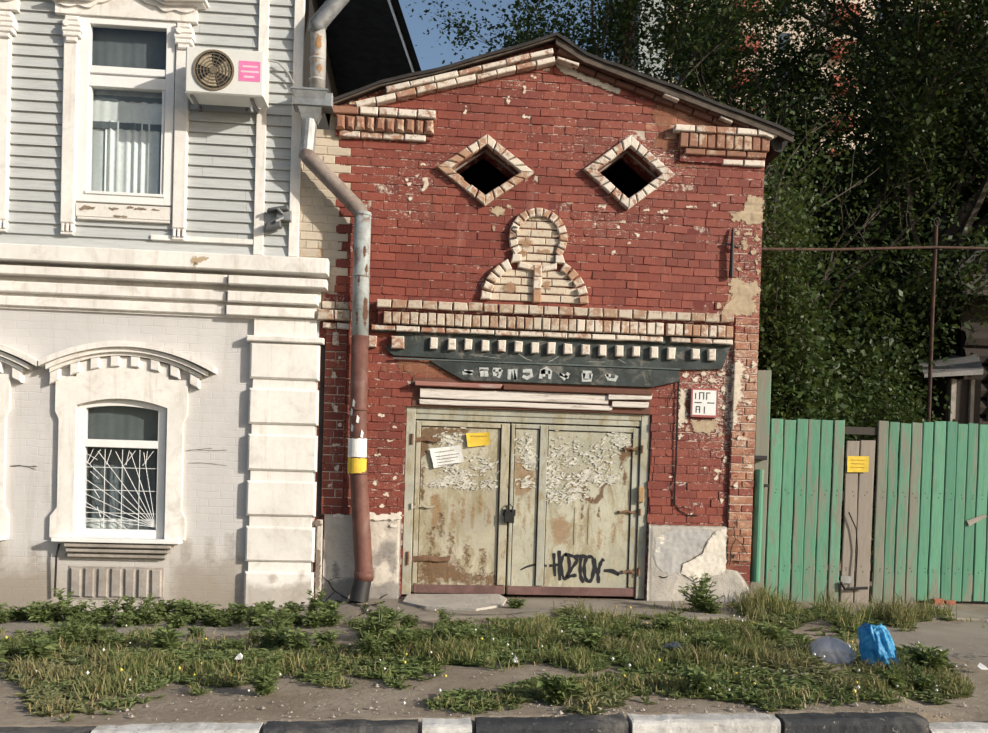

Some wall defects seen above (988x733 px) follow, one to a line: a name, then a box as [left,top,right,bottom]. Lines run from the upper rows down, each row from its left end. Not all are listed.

peeling [717,195,765,317]
corrosion [581,483,606,519]
corrosion [415,513,495,585]
spalling [679,526,749,581]